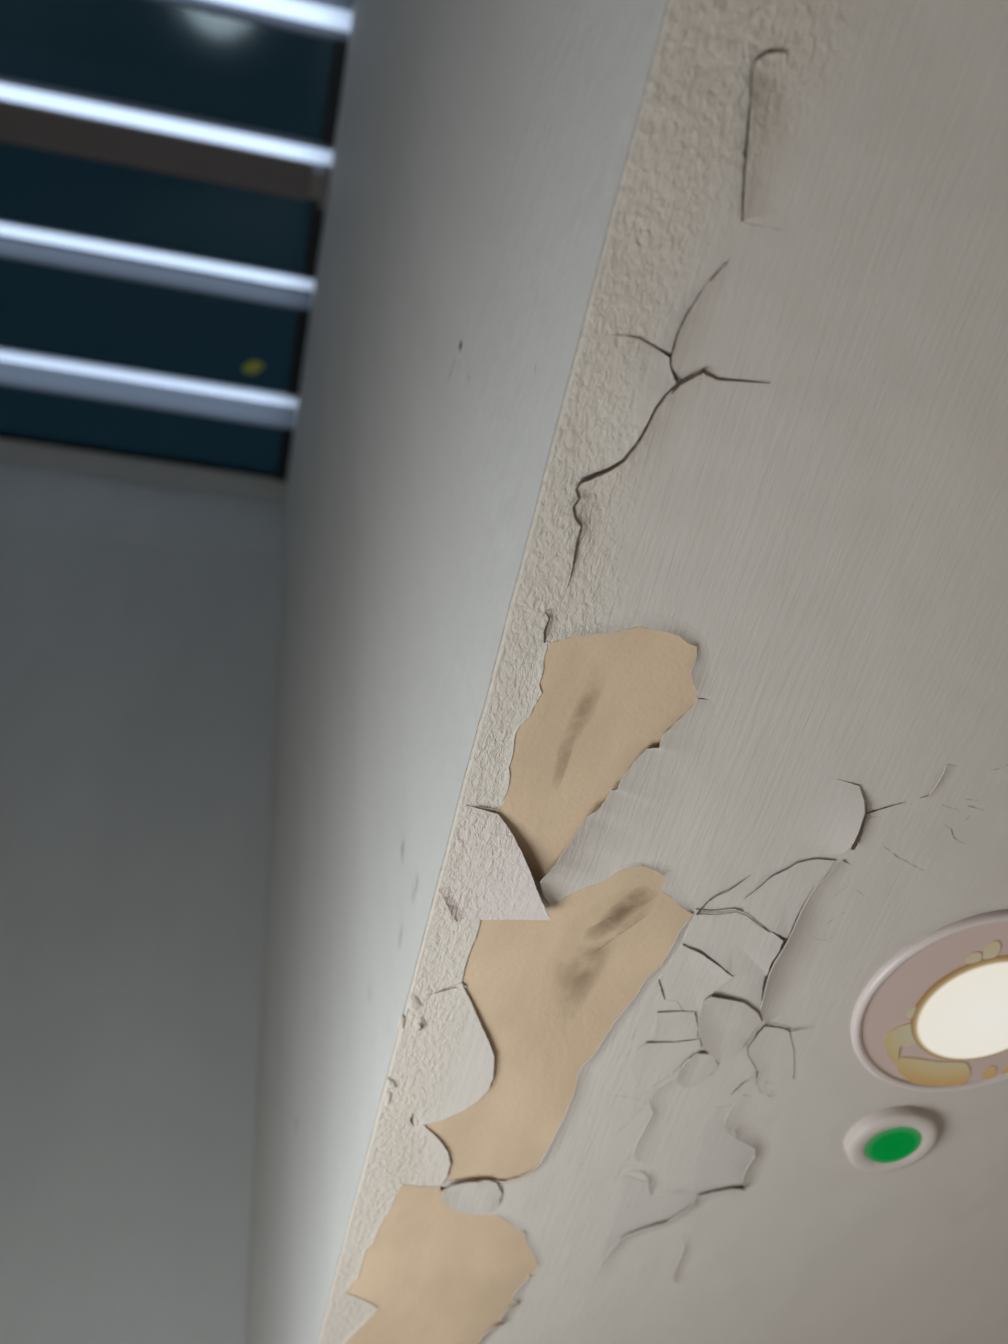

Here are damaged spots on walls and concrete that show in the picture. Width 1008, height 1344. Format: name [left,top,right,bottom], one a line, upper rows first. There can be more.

crack [544,261,766,643]
peeling [339,613,852,1344]